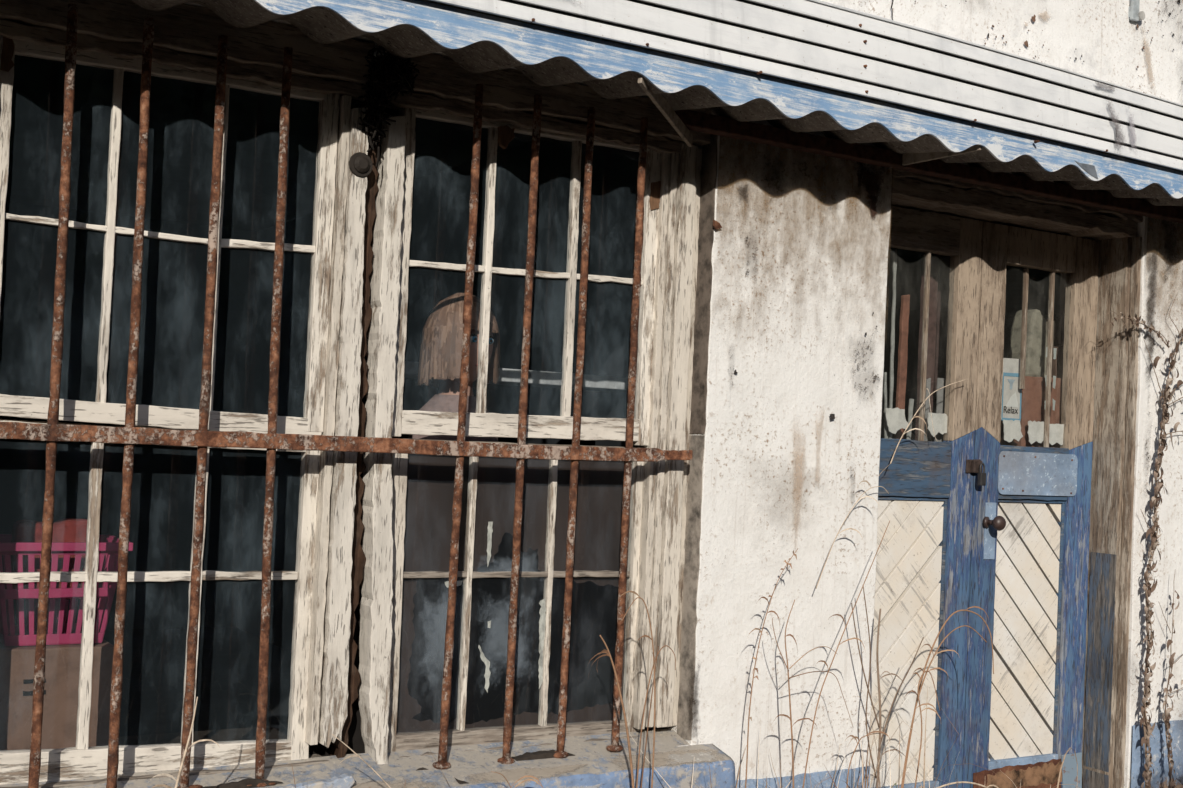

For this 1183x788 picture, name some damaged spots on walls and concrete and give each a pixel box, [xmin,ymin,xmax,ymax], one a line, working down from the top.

damp [849,312,879,399]
peeling [272,774,433,788]